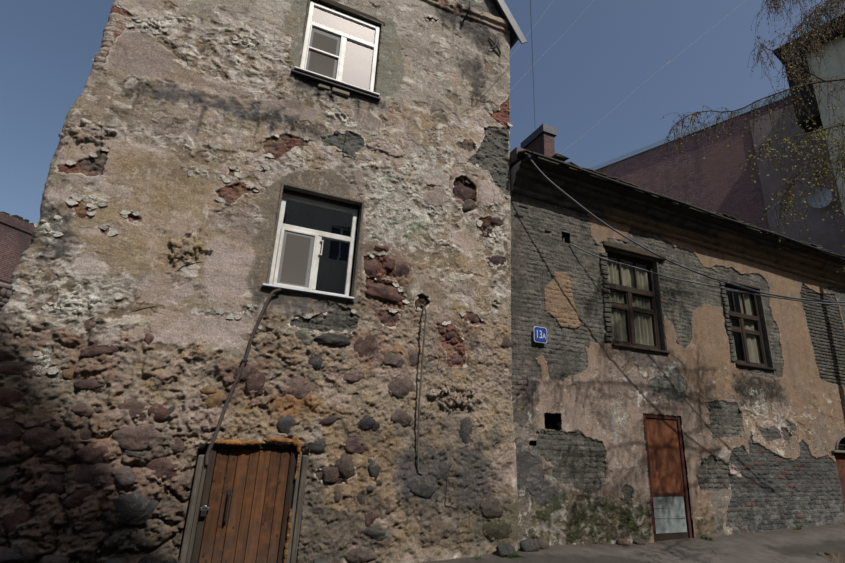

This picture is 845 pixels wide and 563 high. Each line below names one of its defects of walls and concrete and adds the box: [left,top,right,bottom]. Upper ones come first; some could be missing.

spalling [58,147,109,176]
spalling [182,165,258,206]
spalling [256,134,309,172]
peeling [320,106,435,159]
spalling [450,176,476,202]
flaking render [456,98,784,401]
spalling [364,253,430,327]
spalling [436,310,486,368]
flaking render [800,283,845,387]
flaking render [529,412,609,495]
flaking render [696,400,845,535]